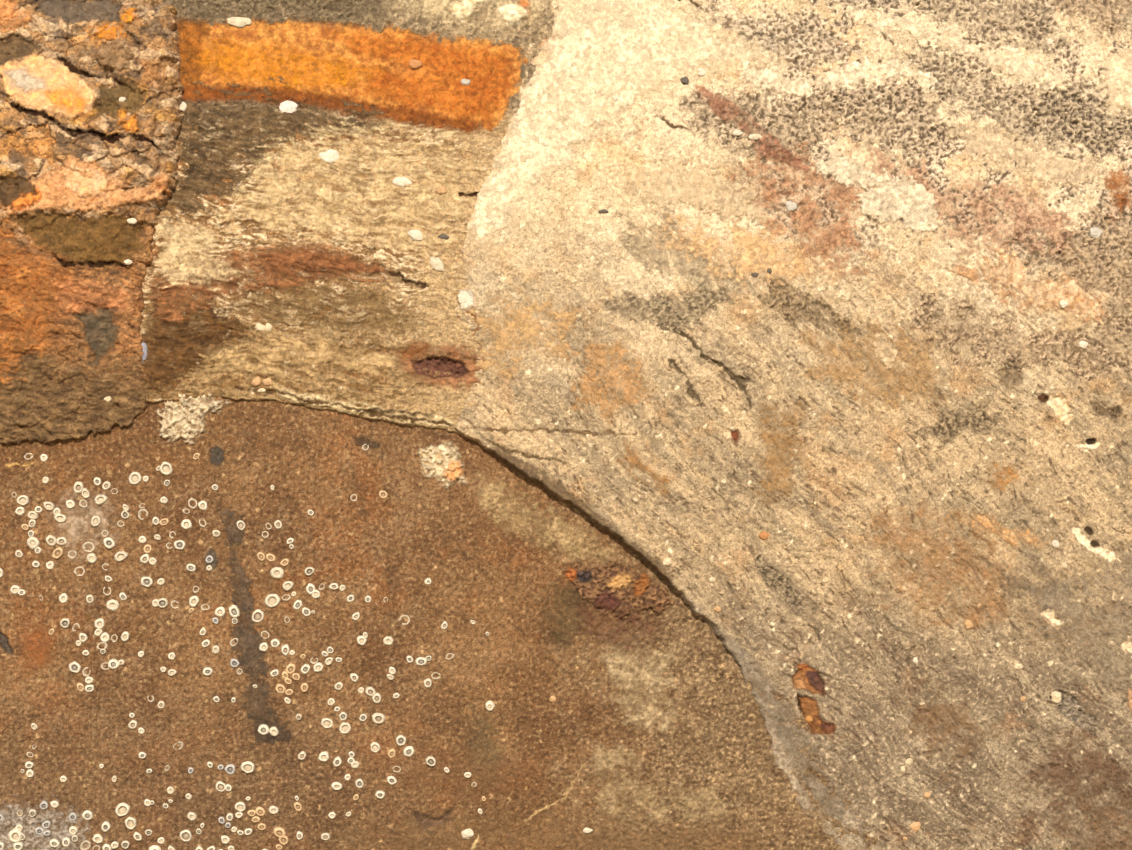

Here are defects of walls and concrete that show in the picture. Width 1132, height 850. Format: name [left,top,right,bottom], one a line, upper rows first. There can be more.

crack [57,56,135,92]
corrosion [177,18,528,132]
water stain [843,3,1076,92]
crack [10,102,161,150]
water stain [137,0,942,444]
crack [661,328,752,407]